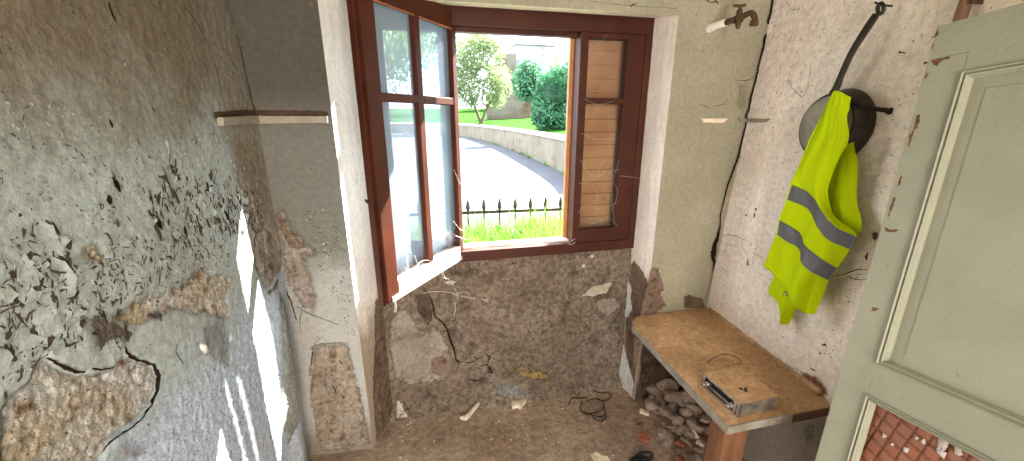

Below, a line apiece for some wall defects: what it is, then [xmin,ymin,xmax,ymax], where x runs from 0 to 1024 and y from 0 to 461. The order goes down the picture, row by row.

crack [700,0,792,298]
spalling [0,102,371,461]
spalling [389,294,462,418]
crack [417,287,484,373]
peeling [577,261,666,397]